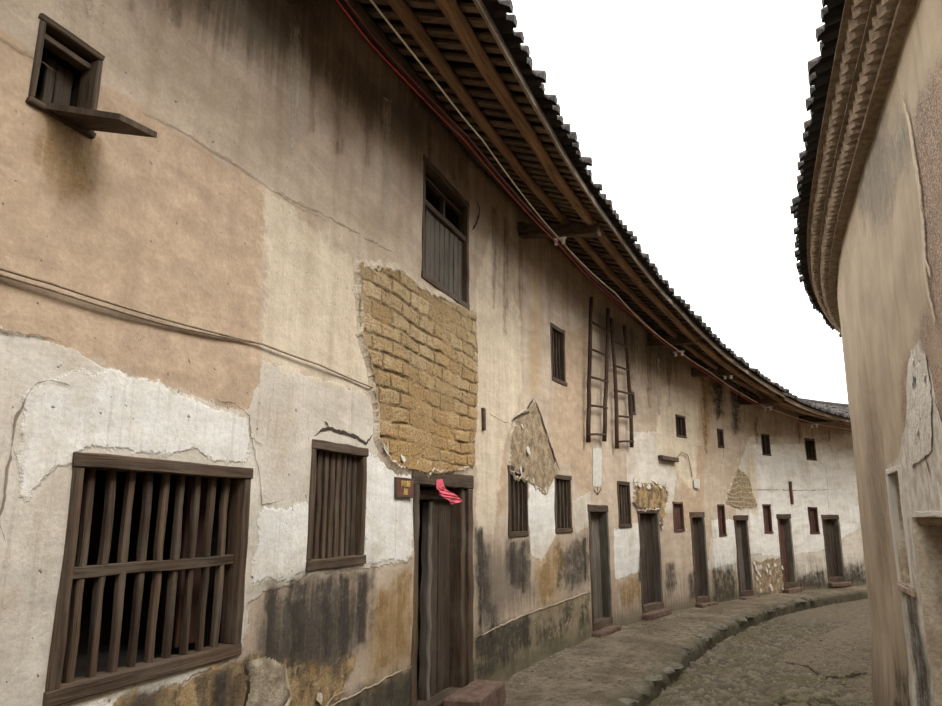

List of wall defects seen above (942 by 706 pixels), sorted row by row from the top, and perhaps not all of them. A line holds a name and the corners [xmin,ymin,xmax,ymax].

flaking render [353,258,479,478]
flaking render [906,349,932,466]
crack [0,380,70,539]
flaking render [508,401,558,495]
flaking render [632,477,669,531]
flaking render [725,468,757,510]
water stain [265,589,277,659]
water stain [321,575,367,655]
water stain [475,528,530,678]
water stain [558,539,589,590]
peeling [753,558,784,594]
water stain [132,689,161,706]